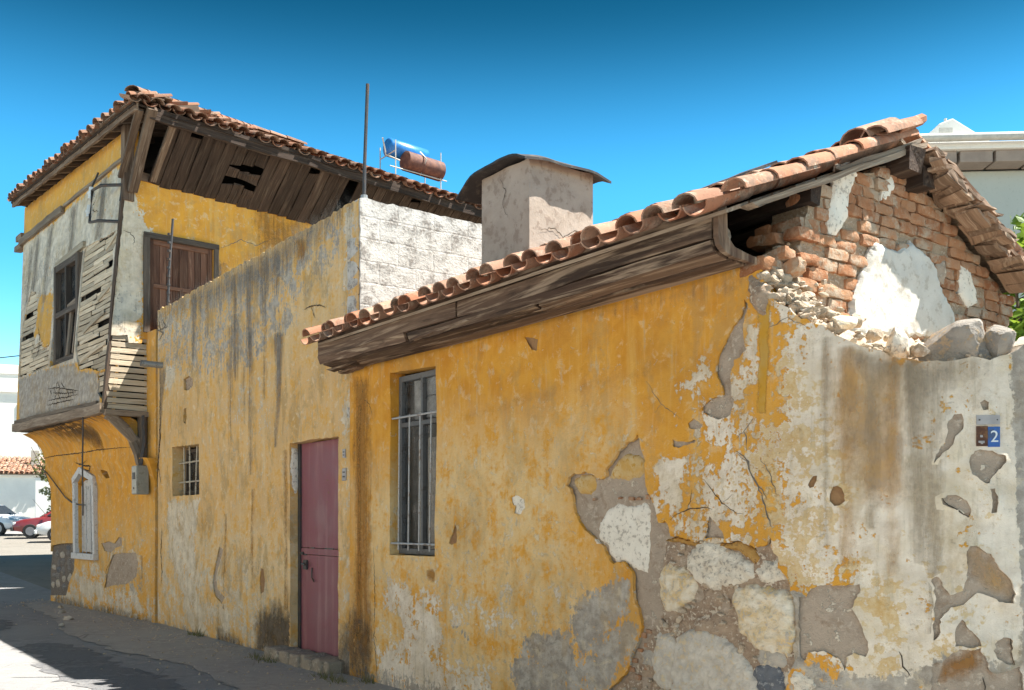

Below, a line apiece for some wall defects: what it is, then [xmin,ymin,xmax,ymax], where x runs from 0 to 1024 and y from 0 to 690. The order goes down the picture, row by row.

leakage [192,213,312,369]
peeling [674,302,748,448]
crack [670,419,776,535]
leakage [841,361,900,491]
peeling [934,414,963,462]
peeling [941,495,971,517]
peeling [969,450,1006,513]
spalling [51,543,75,595]
leakage [257,606,290,650]
peeling [569,438,869,690]
peeling [931,546,1015,640]
peeling [930,620,1022,690]